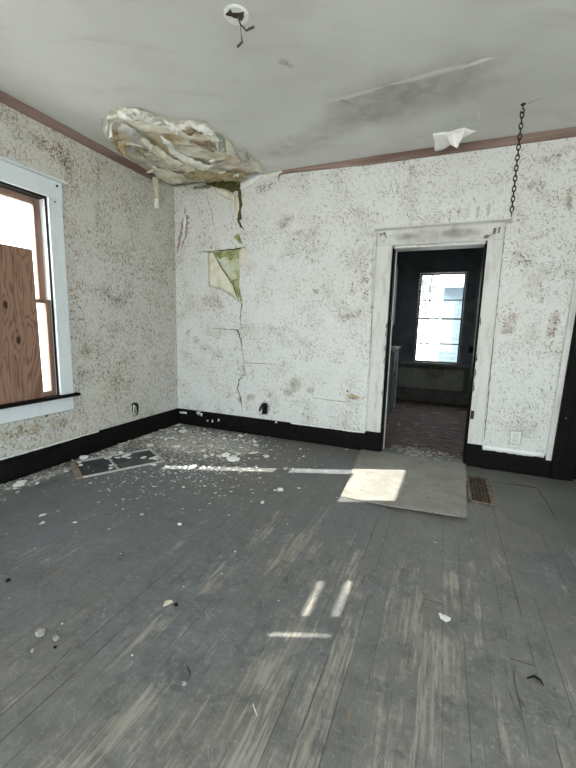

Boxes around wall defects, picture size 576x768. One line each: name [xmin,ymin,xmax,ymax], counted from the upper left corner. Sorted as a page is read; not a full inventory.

crack [300,57,495,106]
peeling [101,106,282,244]
crack [212,303,275,406]